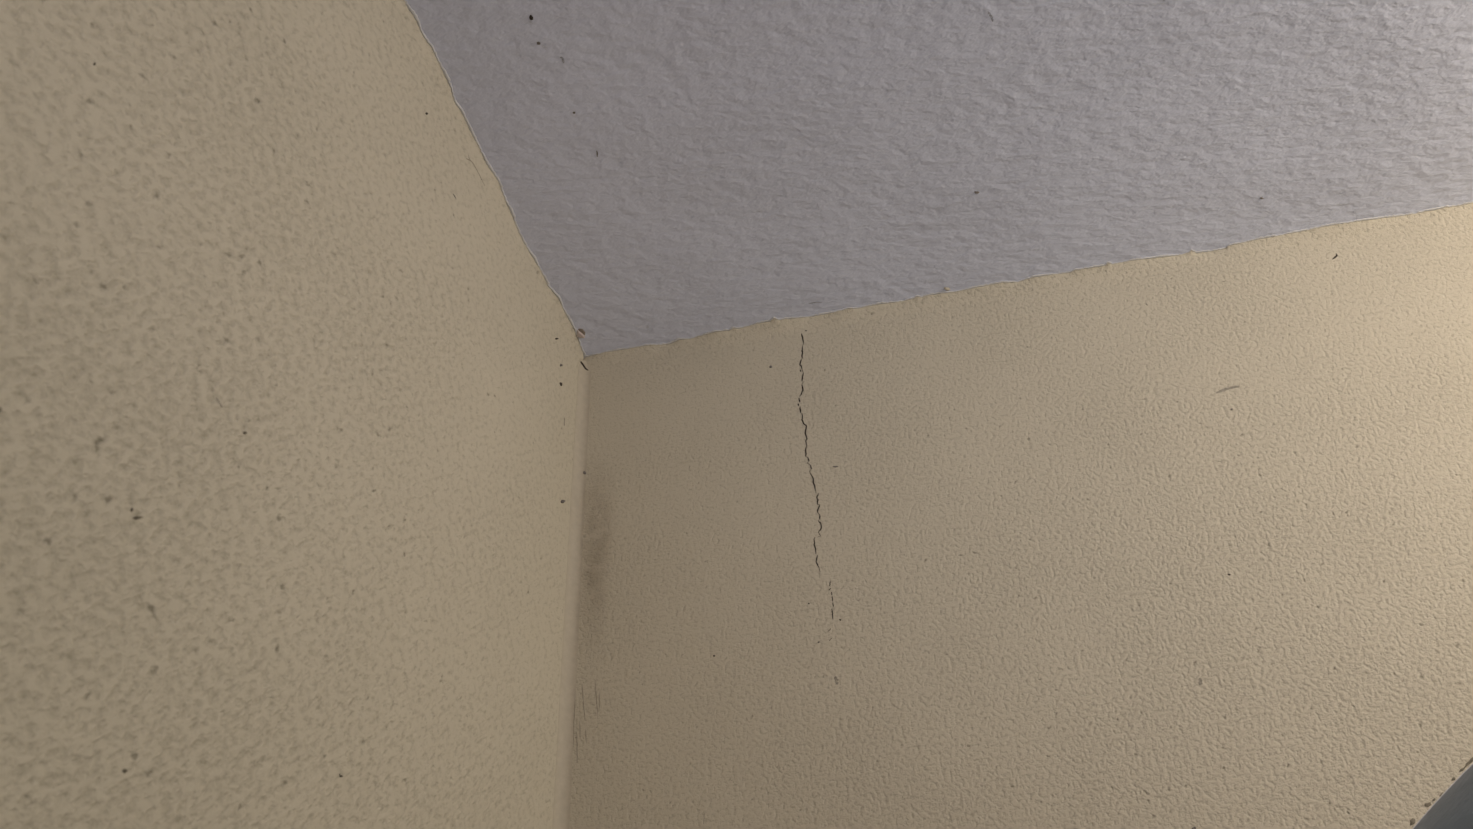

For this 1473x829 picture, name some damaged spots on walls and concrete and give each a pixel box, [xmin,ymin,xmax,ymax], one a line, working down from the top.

crack [798,333,834,641]